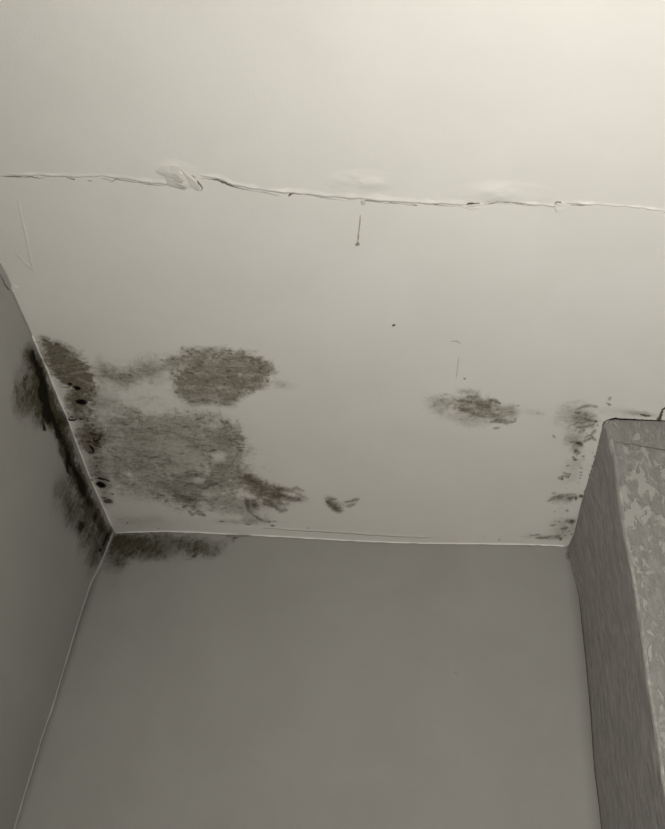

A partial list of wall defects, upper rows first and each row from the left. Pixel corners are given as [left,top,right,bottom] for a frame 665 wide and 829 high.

crack [7,171,168,185]
crack [193,174,467,206]
crack [487,200,665,211]
damp [447,393,513,422]
crack [602,407,665,426]
damp [15,339,300,566]